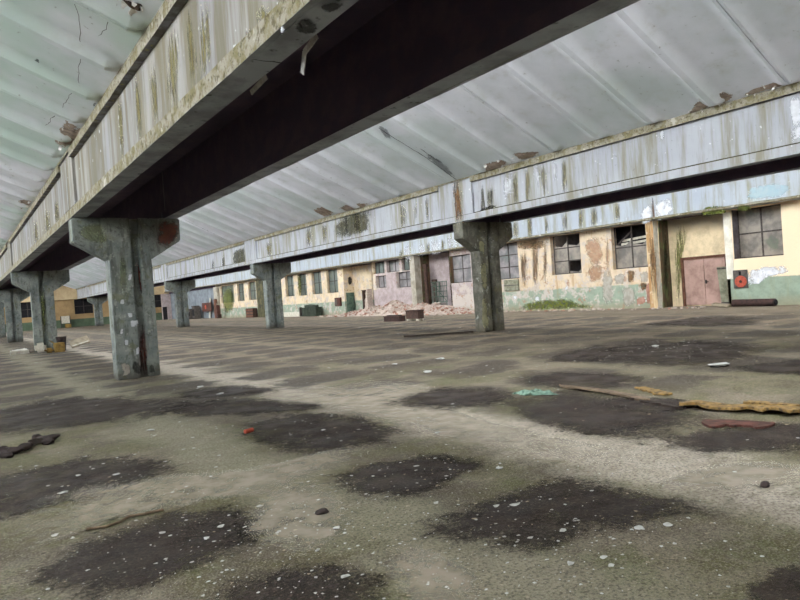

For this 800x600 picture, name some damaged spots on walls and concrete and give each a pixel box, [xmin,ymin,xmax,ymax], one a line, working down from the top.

spalling [117,0,143,16]
leakage [187,11,211,77]
crack [45,4,81,126]
leakage [167,38,178,101]
spalling [55,120,81,151]
spalling [481,152,539,171]
leakage [504,163,567,200]
rust [453,183,461,221]
peeling [641,199,673,224]
rust [157,221,178,245]
leakage [513,221,547,285]
peeling [748,266,788,284]